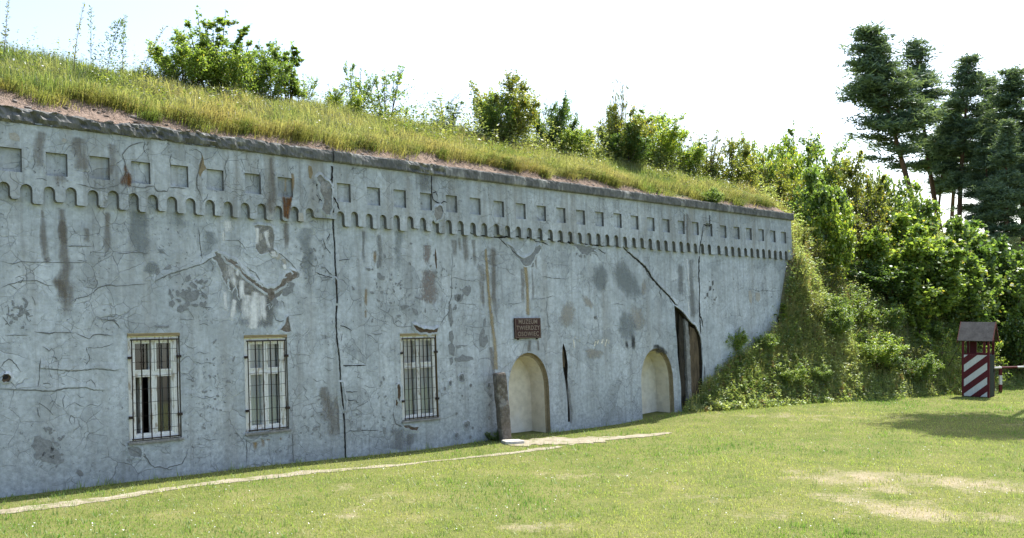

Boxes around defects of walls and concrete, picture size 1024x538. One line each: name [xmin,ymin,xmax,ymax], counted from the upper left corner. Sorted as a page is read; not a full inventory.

rust [283,174,294,218]
leakage [55,214,71,304]
crack [0,233,260,425]
spalling [155,222,328,328]
spalling [278,313,293,335]
crack [273,166,415,458]
leakage [482,250,498,369]
crack [431,175,710,334]
leakage [595,267,645,294]
spalling [0,371,14,385]
crack [121,443,188,470]